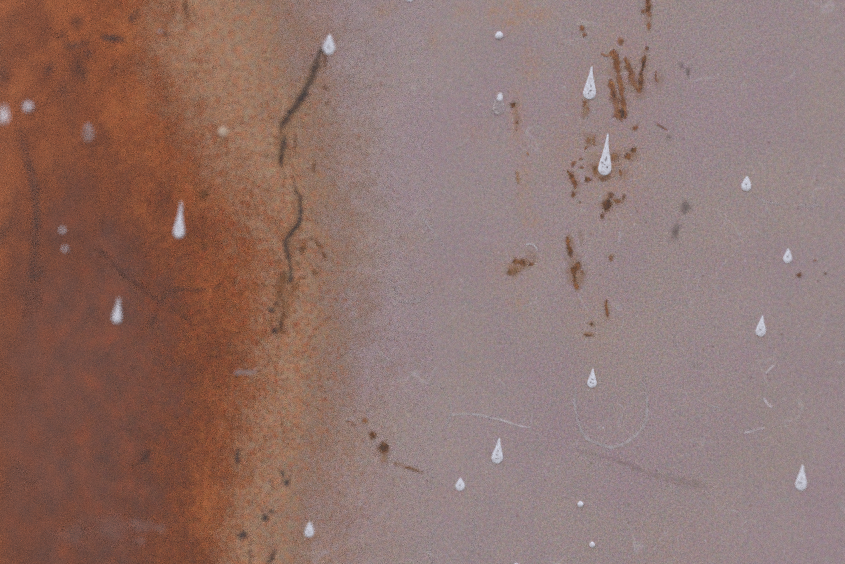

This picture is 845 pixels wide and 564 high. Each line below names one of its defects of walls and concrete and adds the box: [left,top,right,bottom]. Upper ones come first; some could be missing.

crack [279,50,328,165]
corrosion [601,39,648,120]
corrosion [567,137,609,197]
corrosion [0,0,405,564]
crack [267,186,309,335]
corrosion [508,259,534,275]
corrosion [566,237,583,289]